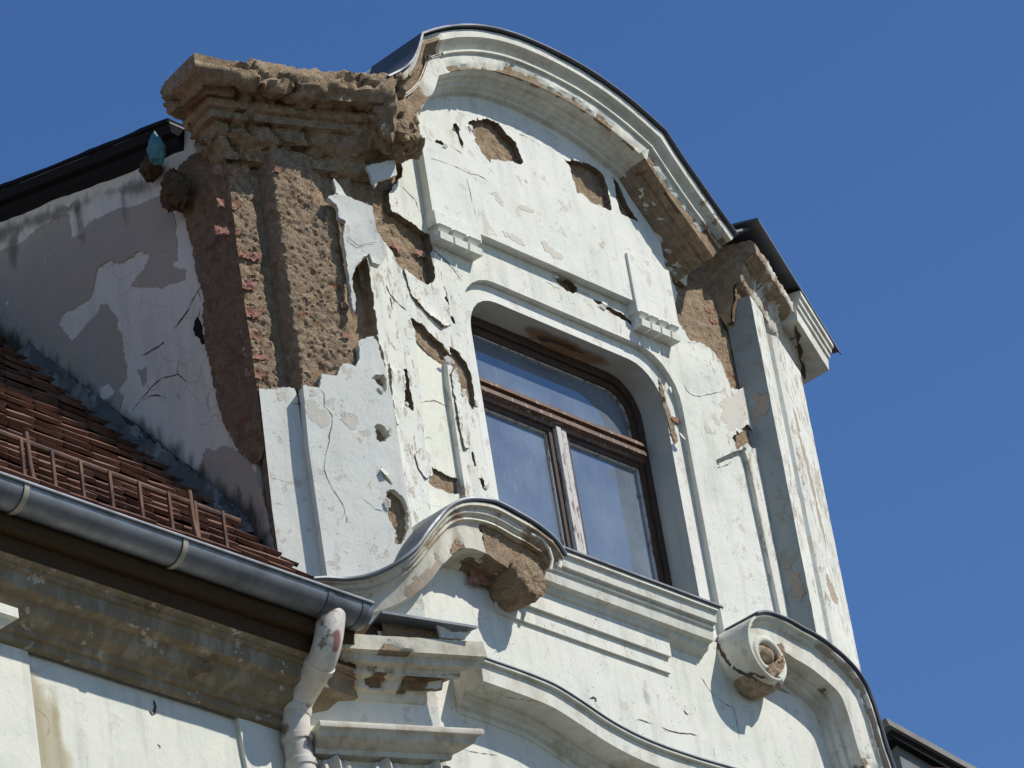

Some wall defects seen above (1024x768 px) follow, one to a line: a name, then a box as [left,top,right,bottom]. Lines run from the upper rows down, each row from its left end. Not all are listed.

spalling [435,116,518,164]
spalling [567,157,629,218]
spalling [744,254,791,321]
crack [134,287,201,408]
flaking render [0,149,457,555]
spalling [672,261,769,449]
spalling [659,378,685,443]
crack [320,389,382,523]
spalling [496,557,546,610]